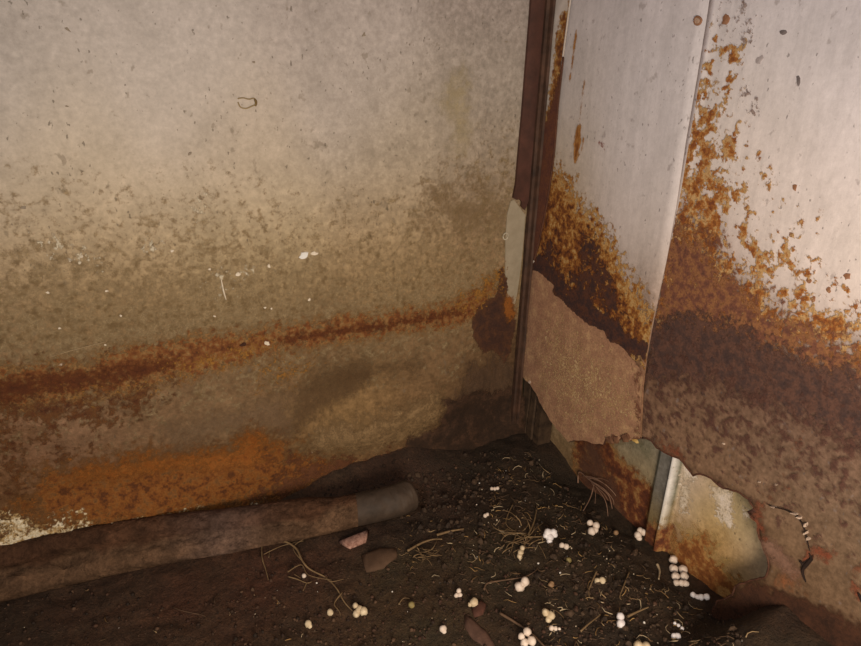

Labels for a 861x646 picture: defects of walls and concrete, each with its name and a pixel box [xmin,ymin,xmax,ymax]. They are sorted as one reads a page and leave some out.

efflorescence [0,508,93,545]
rust [0,261,516,539]
rust [532,1,861,598]